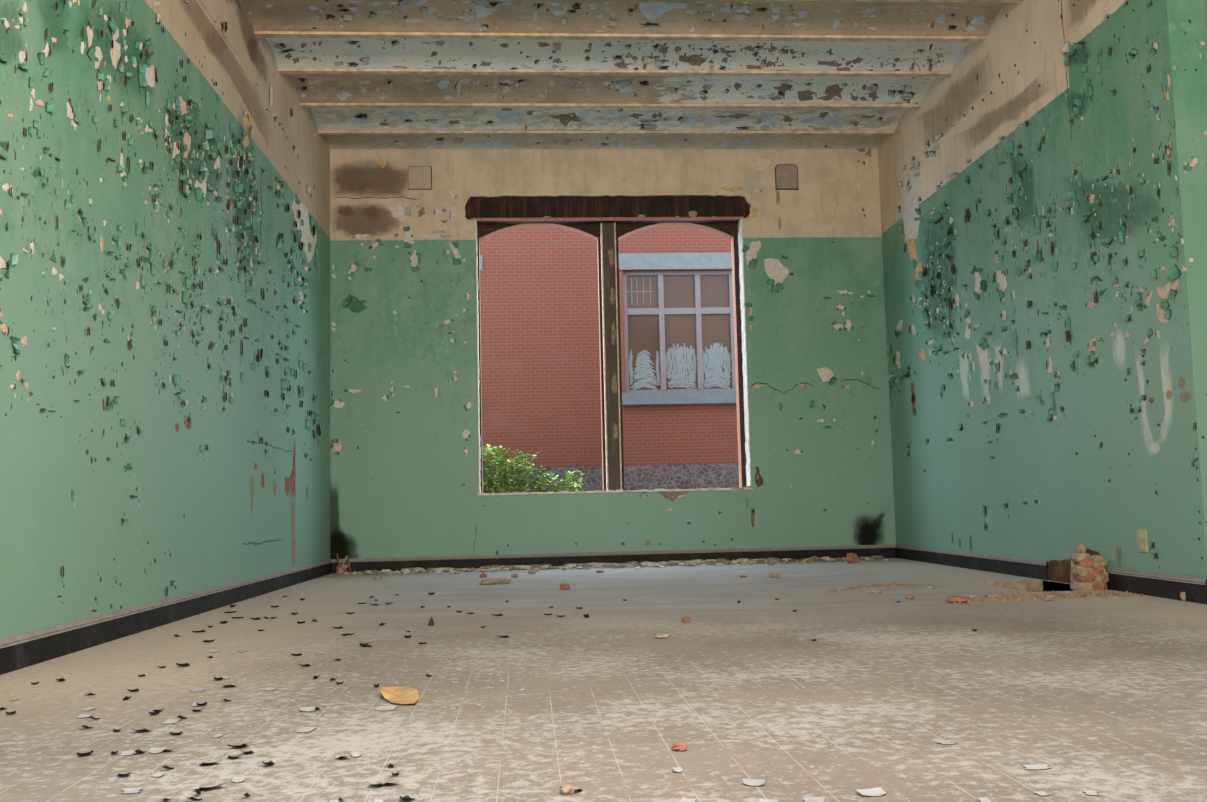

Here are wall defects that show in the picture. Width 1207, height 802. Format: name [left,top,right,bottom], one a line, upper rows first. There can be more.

damp [342,169,399,193]
peeling [0,0,465,498]
damp [340,207,387,232]
peeling [742,241,794,293]
peeling [887,0,1198,459]
peeling [823,290,876,341]
crack [750,382,812,395]
peeling [817,367,850,389]
rust [251,451,309,563]
damp [330,494,354,559]
damp [858,516,883,545]